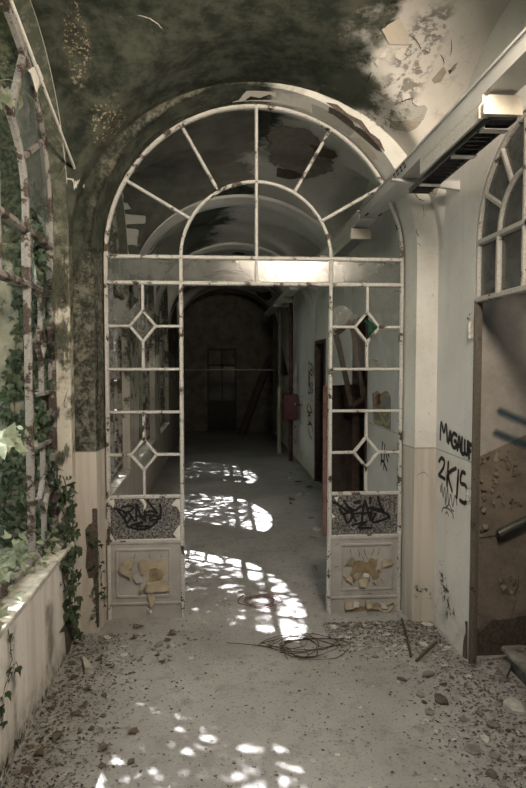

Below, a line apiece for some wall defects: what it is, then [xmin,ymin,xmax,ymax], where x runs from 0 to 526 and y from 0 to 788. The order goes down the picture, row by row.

peeling [374,19,409,66]
peeling [432,64,457,83]
peeling [265,125,337,179]
peeling [234,91,385,160]
peeling [390,99,427,132]
water stain [31,0,402,362]
peeling [118,558,169,614]
peeling [344,548,395,588]